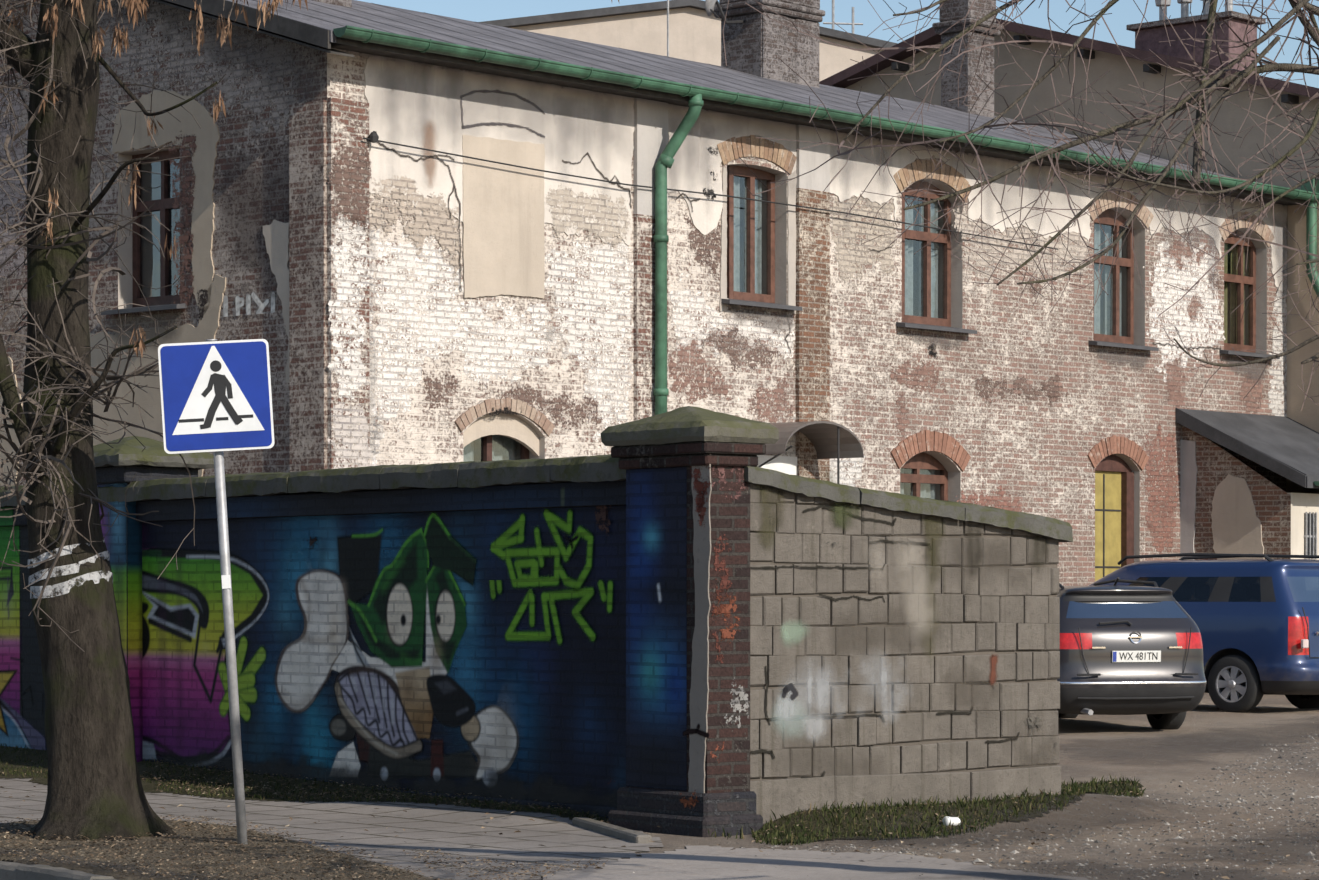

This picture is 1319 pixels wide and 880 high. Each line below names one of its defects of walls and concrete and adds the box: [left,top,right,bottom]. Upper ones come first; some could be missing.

peeling [325,55,634,298]
peeling [90,90,226,446]
peeling [263,219,290,383]
peeling [830,131,1288,324]
spalling [414,368,461,415]
spalling [479,376,605,436]
spalling [668,322,793,423]
spalling [890,357,950,437]
spalling [975,374,1068,409]